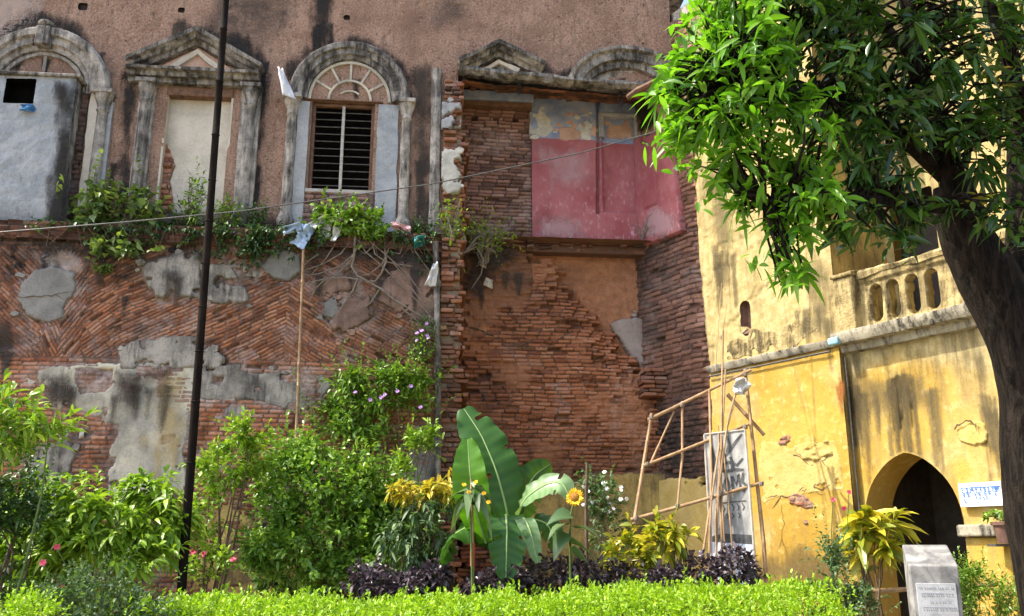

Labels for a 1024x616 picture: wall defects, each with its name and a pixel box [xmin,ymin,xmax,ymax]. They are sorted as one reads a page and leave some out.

damp [286,0,333,79]
damp [45,82,69,221]
peeling [529,106,633,142]
crack [18,291,70,300]
damp [43,375,75,414]
damp [111,369,180,477]
damp [848,375,941,462]
flaking render [780,493,813,524]